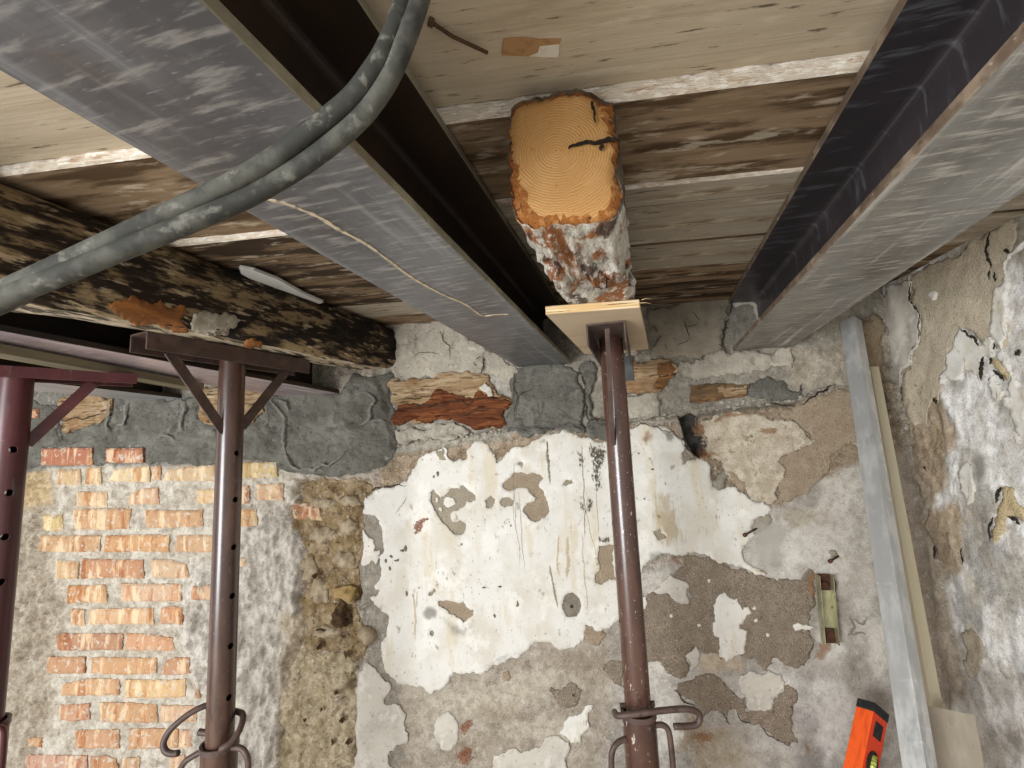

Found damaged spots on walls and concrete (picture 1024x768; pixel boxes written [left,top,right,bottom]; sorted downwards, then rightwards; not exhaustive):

crack [900,278,920,399]
spalling [862,219,1024,436]
flaking render [25,442,215,768]
flaking render [241,462,322,527]
flaking render [352,430,619,768]
spalling [630,389,857,746]
spalling [924,508,955,566]
flaking render [958,462,976,505]
spalling [987,486,1024,543]
spalling [603,660,624,687]
flaking render [961,628,985,679]